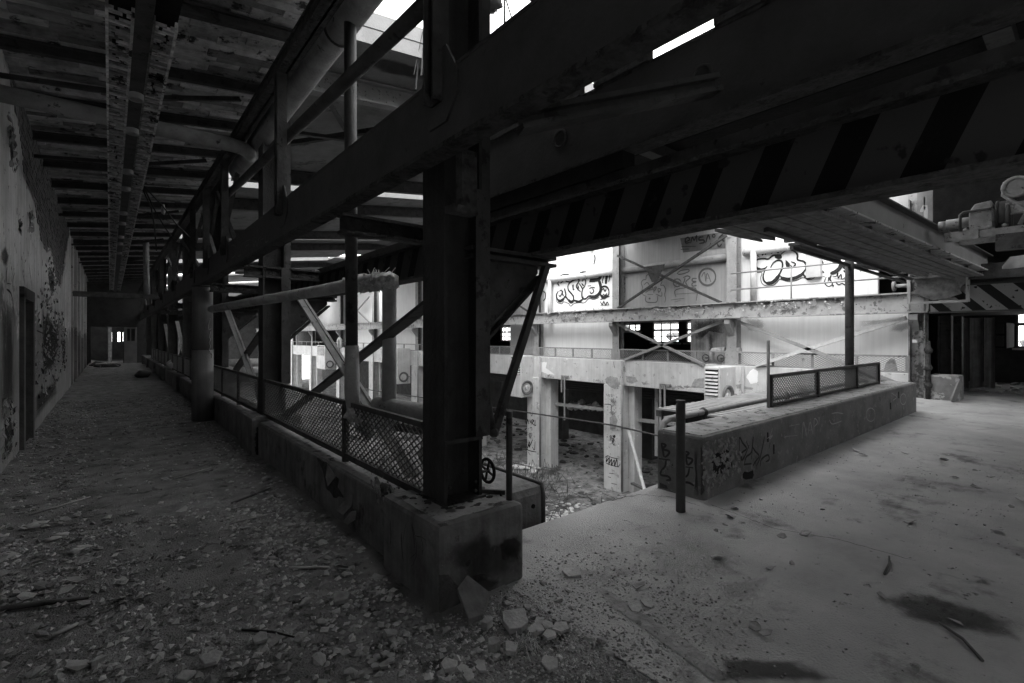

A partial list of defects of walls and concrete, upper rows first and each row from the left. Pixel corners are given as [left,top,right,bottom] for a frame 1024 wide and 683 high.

peeling [7,105,70,409]